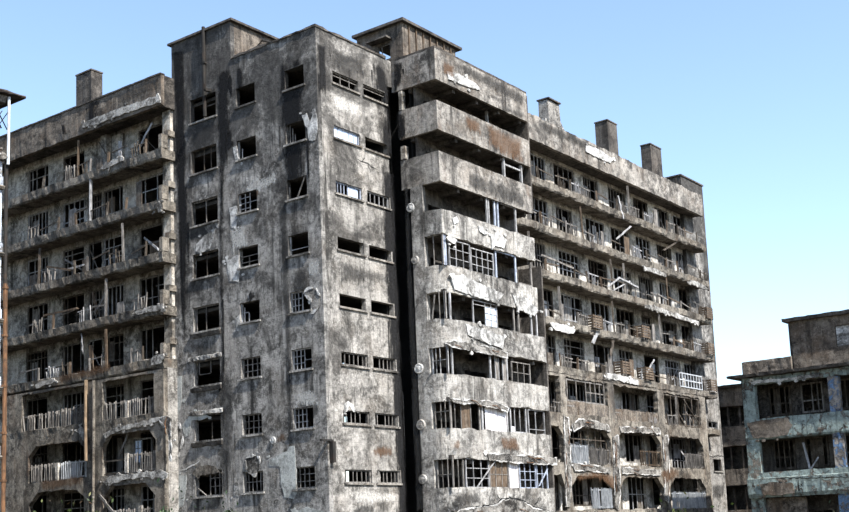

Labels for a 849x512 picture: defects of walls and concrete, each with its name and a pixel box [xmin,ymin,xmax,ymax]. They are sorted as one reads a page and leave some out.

peeling [446,71,480,92]
spalling [81,93,161,128]
leakage [279,59,309,180]
peeling [299,109,318,141]
leakage [173,52,242,490]
peeling [449,273,543,318]
leakage [280,202,309,445]
peeling [549,322,575,334]
spalling [103,416,184,462]
peeling [742,416,792,442]
spalling [97,469,169,486]
spalling [483,416,670,511]